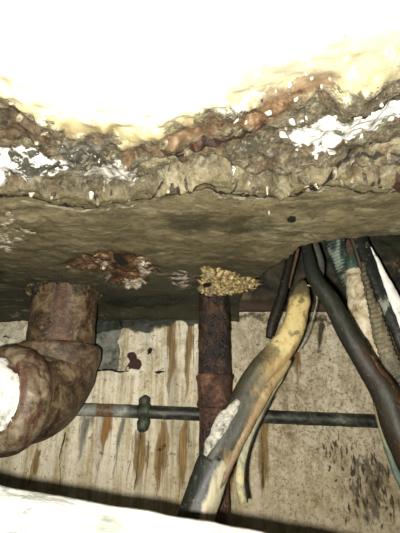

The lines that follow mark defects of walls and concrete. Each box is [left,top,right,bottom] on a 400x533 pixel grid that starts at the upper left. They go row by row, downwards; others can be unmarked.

peeling [0,100,71,184]
leakage [60,141,139,185]
spalling [157,119,266,163]
rust [122,71,335,168]
peeling [279,100,400,160]
spalling [385,171,400,194]
spalling [63,250,160,290]
rust [100,417,113,456]
leakage [322,432,400,523]